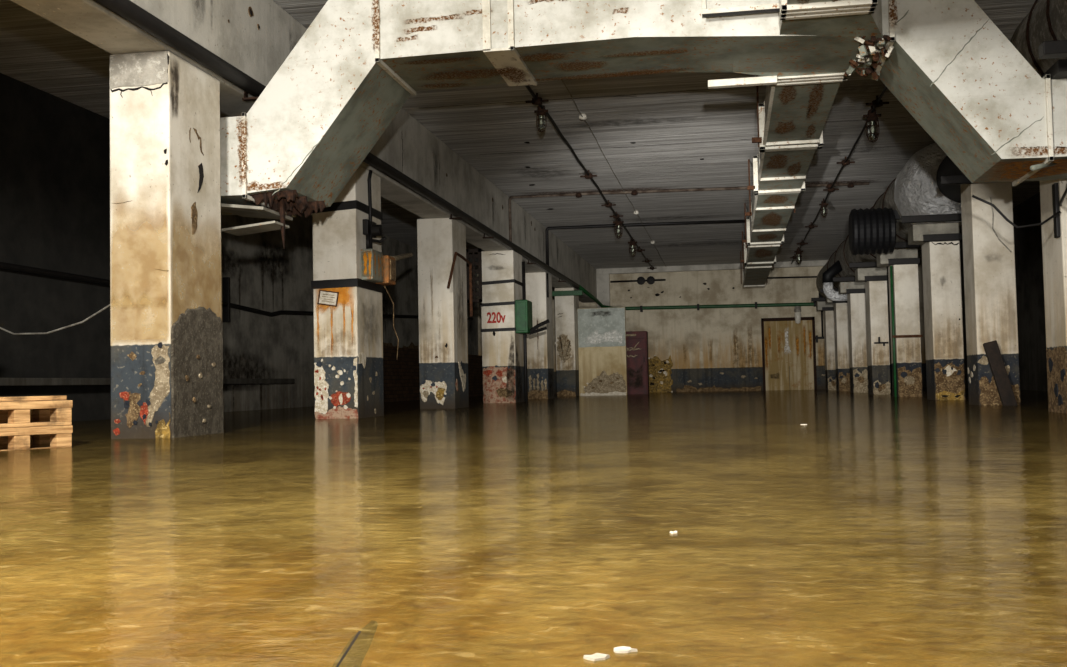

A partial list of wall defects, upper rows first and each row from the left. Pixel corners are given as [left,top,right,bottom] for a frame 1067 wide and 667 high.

corrosion [397,9,482,42]
corrosion [237,120,284,191]
corrosion [996,146,1067,180]
corrosion [755,195,789,258]
damp [112,206,242,341]
corrosion [317,287,354,348]
spalling [113,307,224,438]
peeling [314,358,378,419]
peeling [420,379,447,405]
peeling [458,361,466,392]
peeling [483,365,627,403]
peeling [1046,347,1067,414]